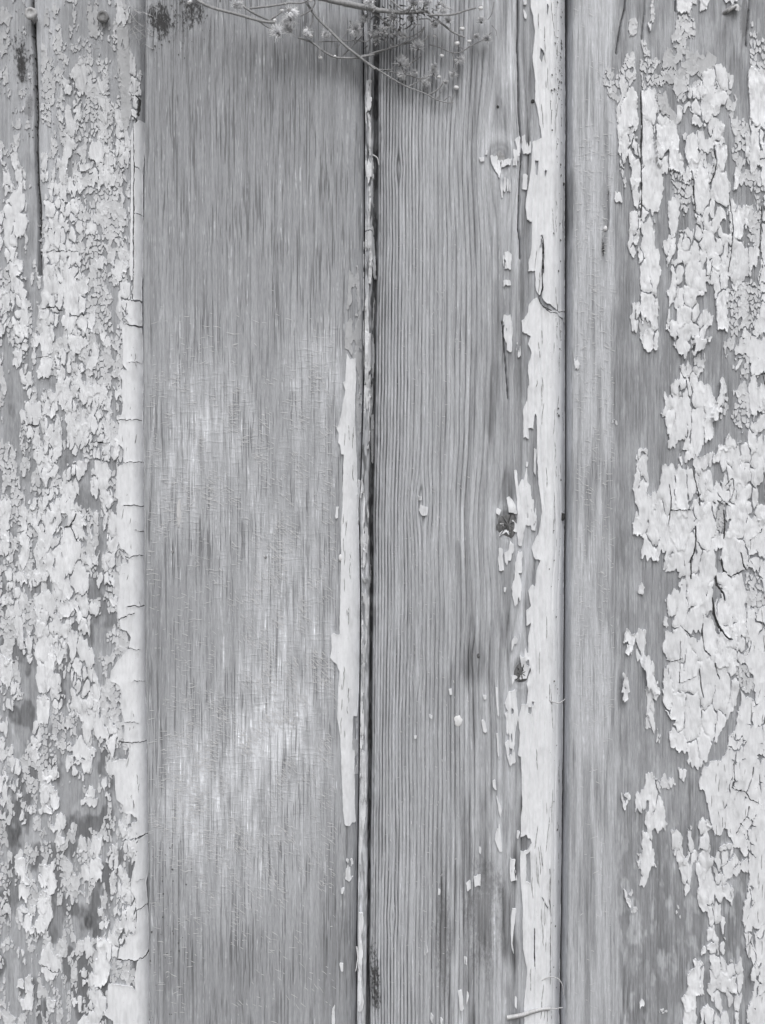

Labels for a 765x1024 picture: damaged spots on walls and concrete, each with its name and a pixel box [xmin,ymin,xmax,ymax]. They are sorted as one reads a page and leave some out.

peeling [0,0,150,1024]
peeling [330,79,377,894]
peeling [458,989,469,1011]
peeling [479,0,580,1024]
crack [516,40,562,319]
peeling [603,0,765,1024]